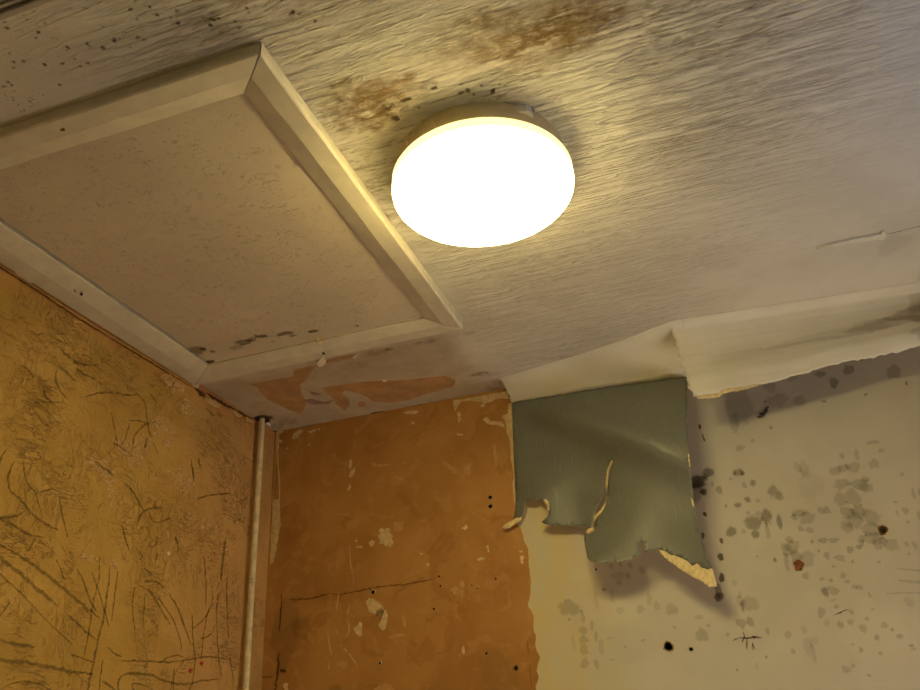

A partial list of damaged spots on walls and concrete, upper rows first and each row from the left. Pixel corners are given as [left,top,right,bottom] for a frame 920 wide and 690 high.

peeling [249,352,354,414]
peeling [322,376,455,424]
flaking render [453,391,508,436]
leakage [691,475,707,495]
flaking render [355,528,393,548]
crack [279,545,433,674]
flaking render [366,590,388,630]
crack [263,654,286,690]